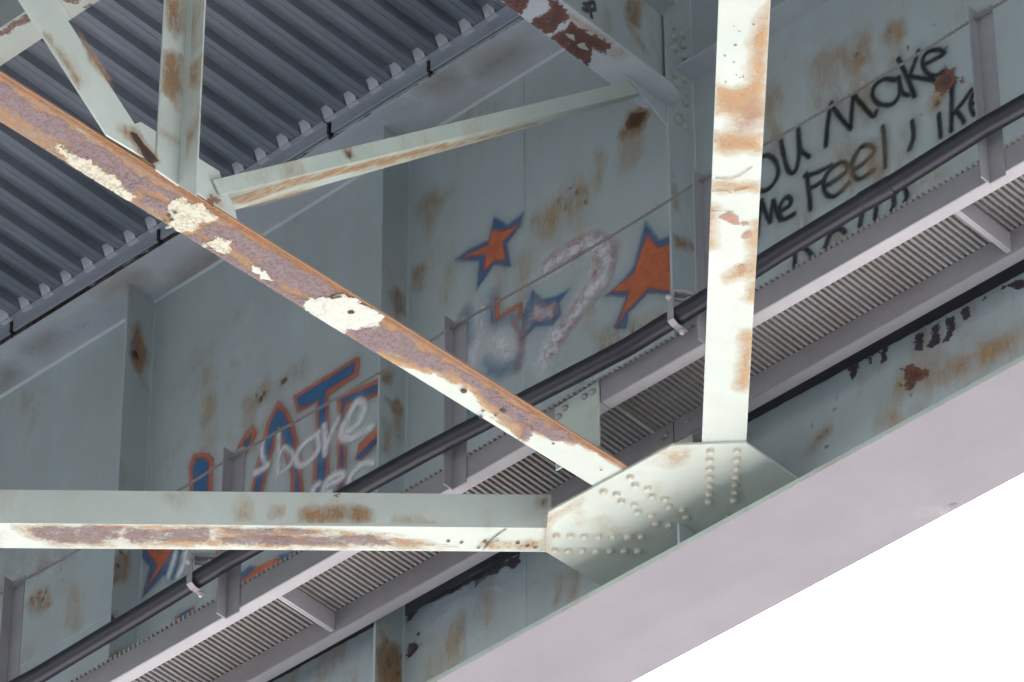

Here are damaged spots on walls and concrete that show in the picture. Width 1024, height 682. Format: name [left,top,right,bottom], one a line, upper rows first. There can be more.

peeling [0,81,179,222]
rust [163,53,196,97]
rust [624,107,647,135]
rust [717,18,768,151]
rust [932,67,964,105]
peeling [187,223,342,305]
rust [0,73,627,469]
rust [727,222,758,301]
peeling [349,322,584,445]
rust [738,333,752,388]
rust [895,364,937,396]
rust [23,493,434,548]